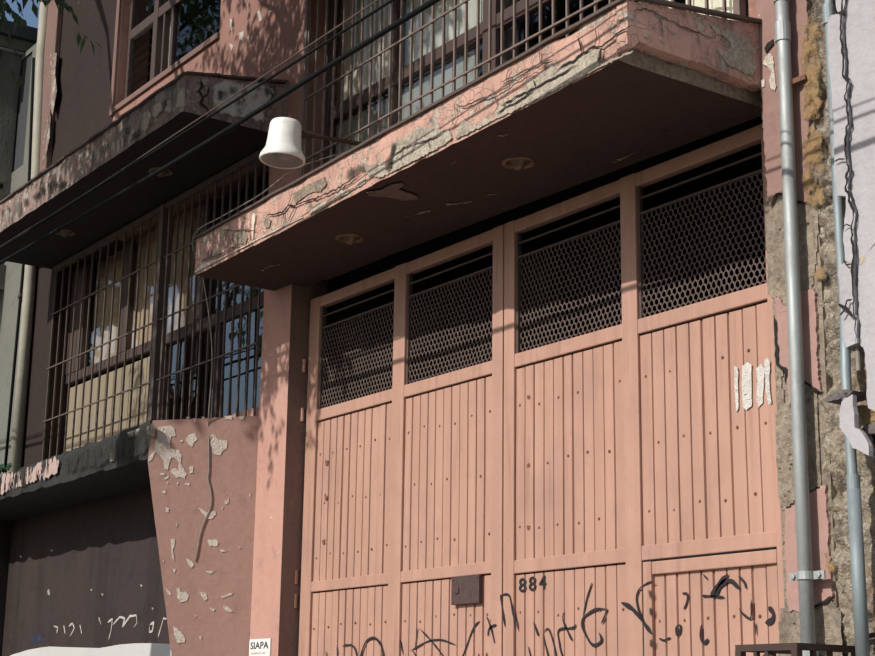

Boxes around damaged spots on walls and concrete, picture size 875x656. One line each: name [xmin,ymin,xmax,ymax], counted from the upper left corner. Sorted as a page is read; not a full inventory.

peeling [42,51,57,164]
peeling [141,87,185,133]
crack [396,8,711,161]
peeling [194,48,634,273]
crack [834,0,875,343]
peeling [0,456,59,495]
peeling [127,417,204,494]
peeling [210,434,227,455]
peeling [198,499,229,519]
peeling [165,587,233,612]
peeling [173,626,185,643]